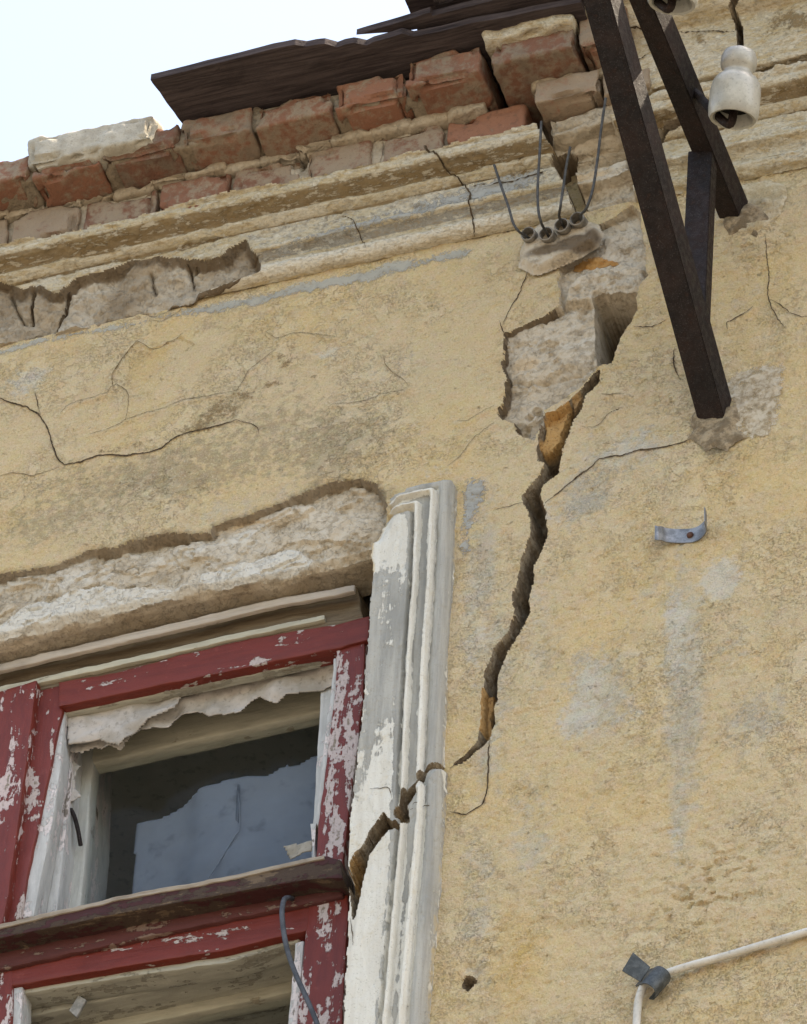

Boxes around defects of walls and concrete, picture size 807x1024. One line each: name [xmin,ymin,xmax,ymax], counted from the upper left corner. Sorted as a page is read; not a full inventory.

crack [423,145,548,237]
flaking render [0,239,261,346]
flaking render [450,116,648,464]
crack [0,394,259,465]
flaking render [0,478,388,664]
crack [348,370,689,941]